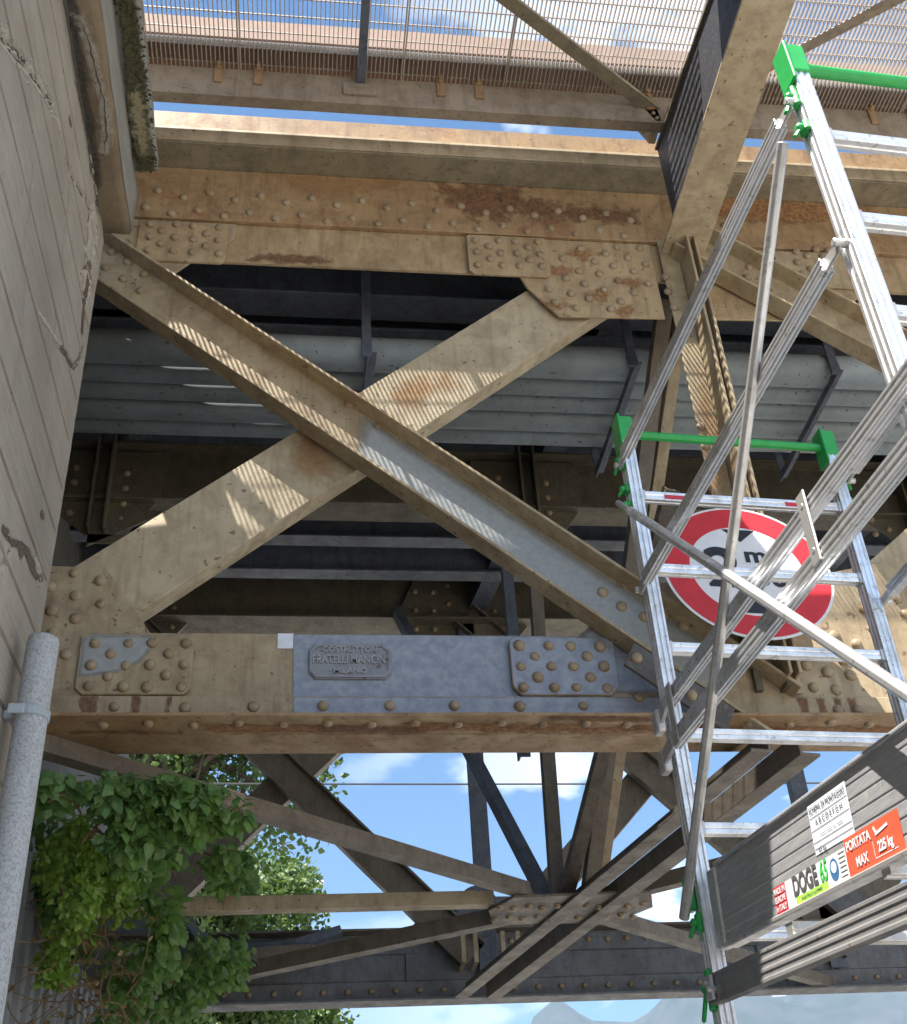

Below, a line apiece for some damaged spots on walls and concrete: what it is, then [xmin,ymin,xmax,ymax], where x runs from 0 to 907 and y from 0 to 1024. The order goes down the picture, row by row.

crack [0,13,114,155]
rust [437,181,637,224]
rust [247,253,329,264]
rust [79,695,98,712]
rust [131,696,140,712]